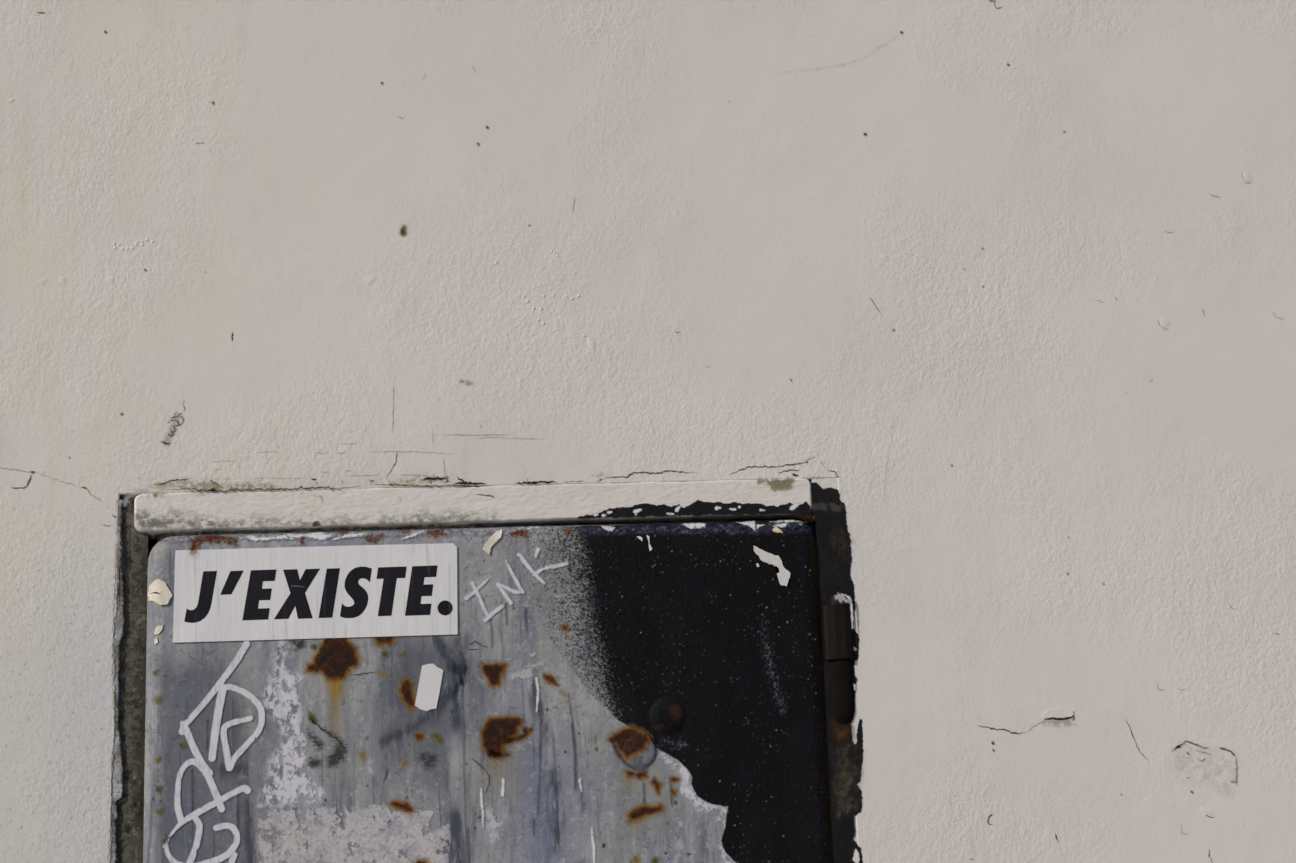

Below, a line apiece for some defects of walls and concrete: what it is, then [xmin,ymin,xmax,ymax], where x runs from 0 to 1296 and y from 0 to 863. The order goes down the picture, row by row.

crack [729,458,840,479]
crack [0,467,127,863]
rust [306,638,359,705]
rust [373,636,405,675]
rust [398,677,416,708]
rust [481,662,507,688]
rust [481,716,533,759]
crack [978,707,1074,734]
rust [607,704,682,822]
spalling [1172,740,1238,784]